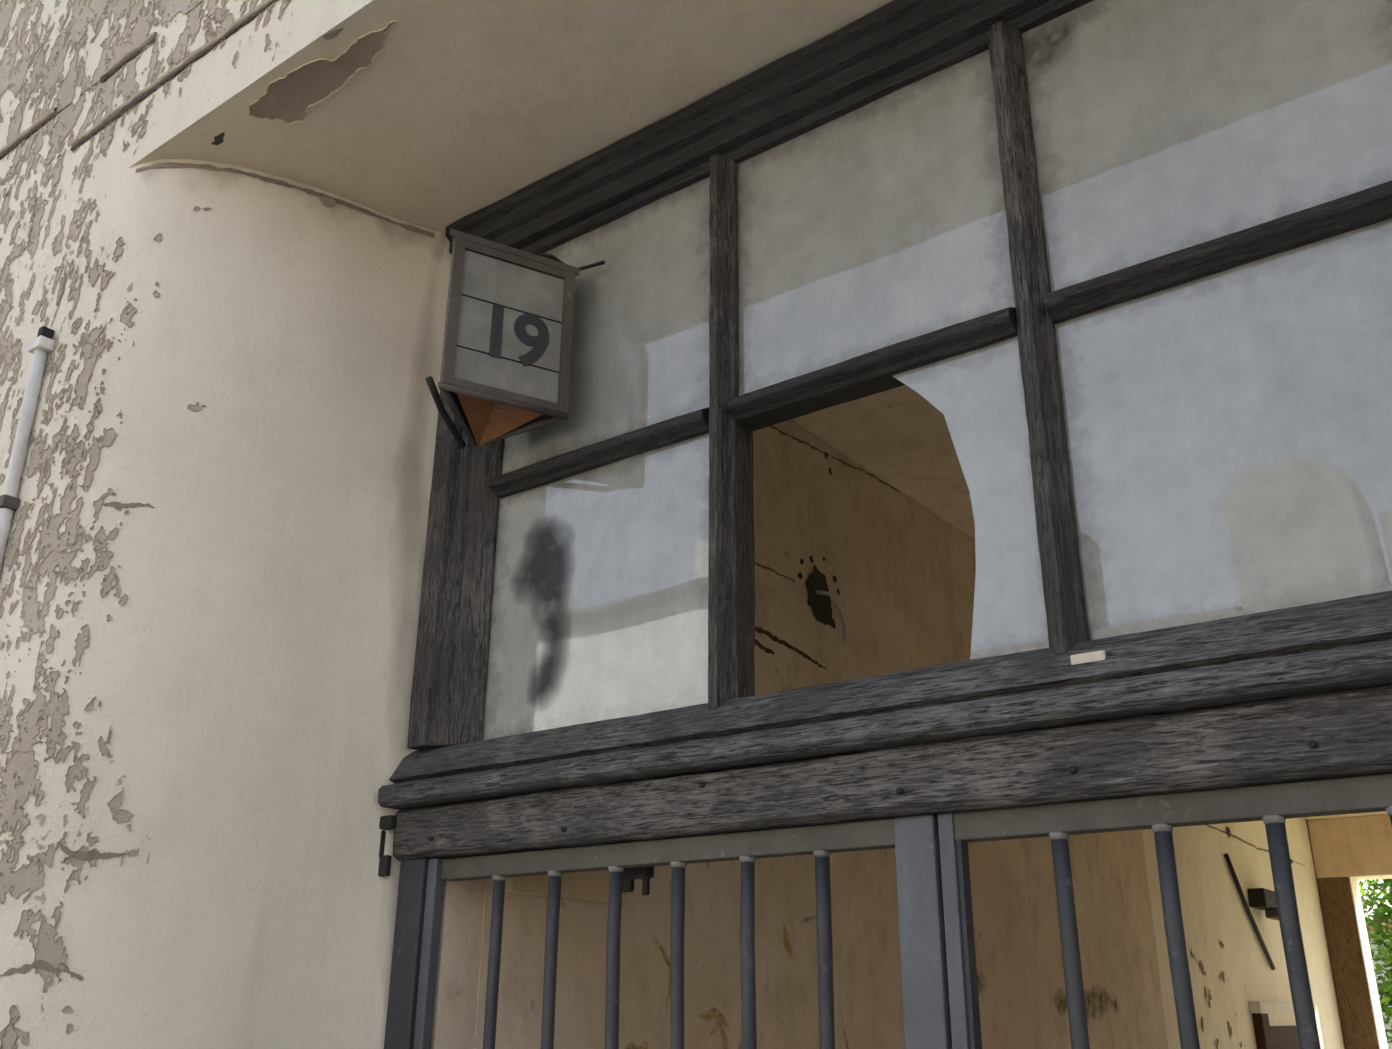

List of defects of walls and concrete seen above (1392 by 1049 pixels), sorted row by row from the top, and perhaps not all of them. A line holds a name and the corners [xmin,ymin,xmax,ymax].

spalling [249,20,396,124]
peeling [0,0,293,1013]
peeling [62,1005,73,1034]